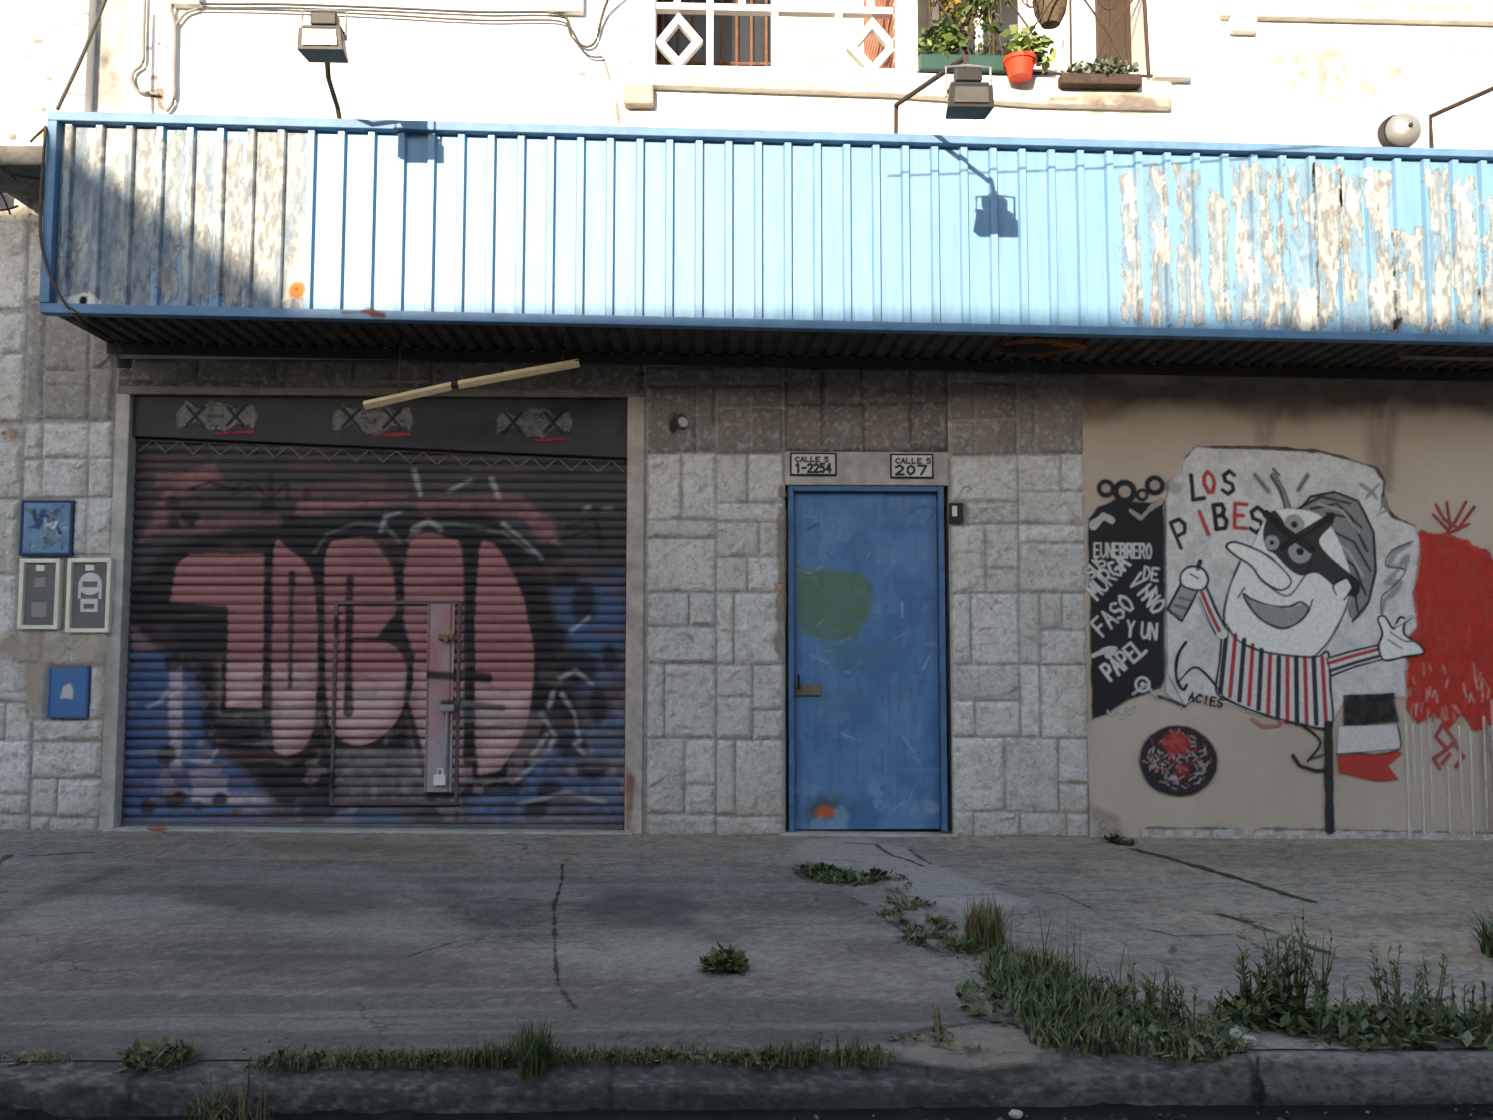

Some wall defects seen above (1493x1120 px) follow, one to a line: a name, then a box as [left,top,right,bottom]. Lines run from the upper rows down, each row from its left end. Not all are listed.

peeling [55,125,307,309]
peeling [1120,158,1493,334]
crack [552,864,577,1009]